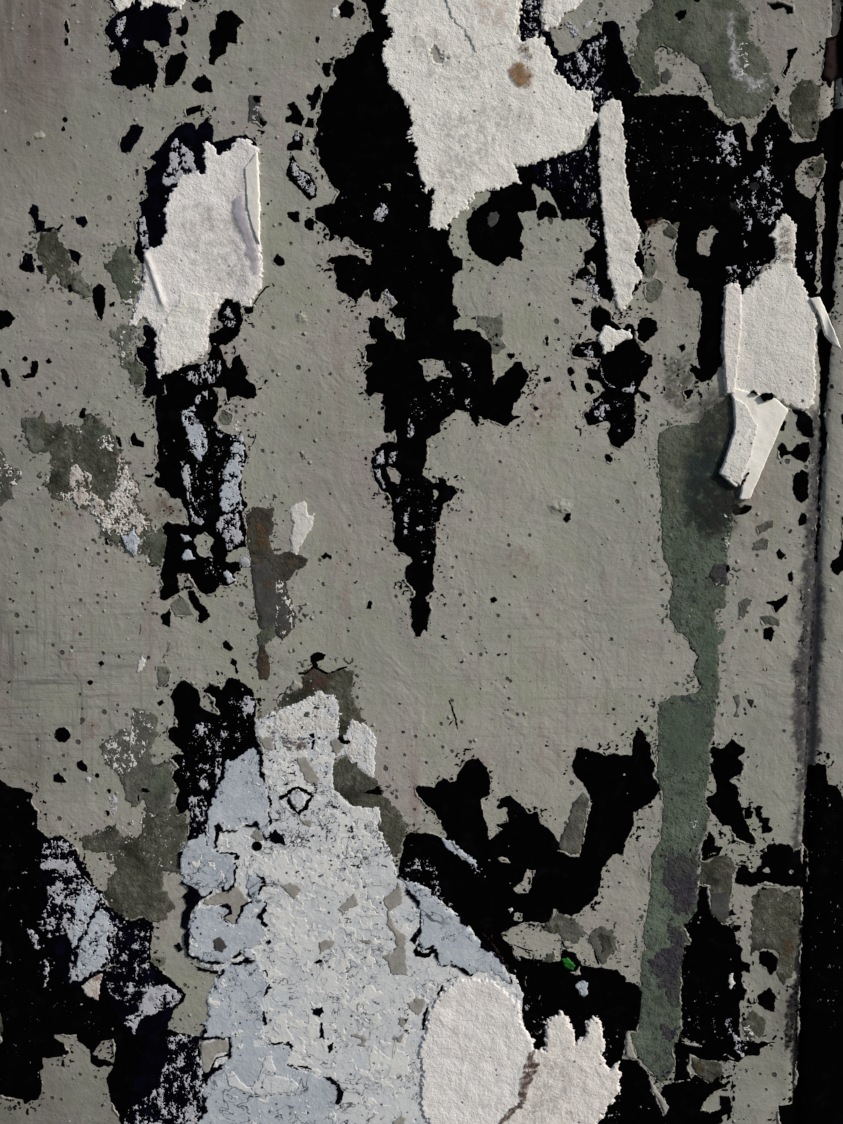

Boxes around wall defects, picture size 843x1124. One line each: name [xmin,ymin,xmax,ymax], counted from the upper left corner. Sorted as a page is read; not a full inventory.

peeling [63,19,71,46]
peeling [99,0,211,105]
peeling [192,10,245,93]
peeling [767,0,795,14]
peeling [285,0,661,639]
peeling [14,95,316,692]
peeling [777,407,814,526]
peeling [742,519,786,560]
peeling [729,598,753,629]
peeling [759,571,795,642]
peeling [77,760,99,783]
peeling [105,789,118,816]